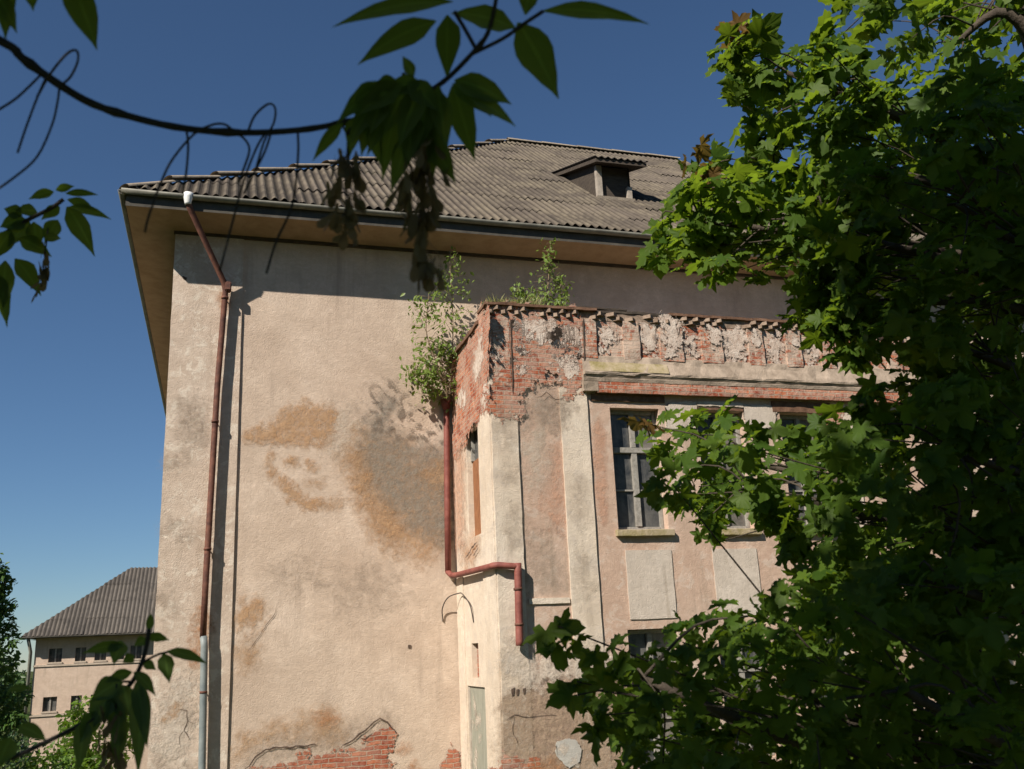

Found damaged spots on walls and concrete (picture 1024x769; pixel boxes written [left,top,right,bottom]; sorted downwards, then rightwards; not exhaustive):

flaking render [472,299,622,424]
flaking render [455,386,467,417]
spalling [235,710,398,769]
spalling [439,742,462,769]